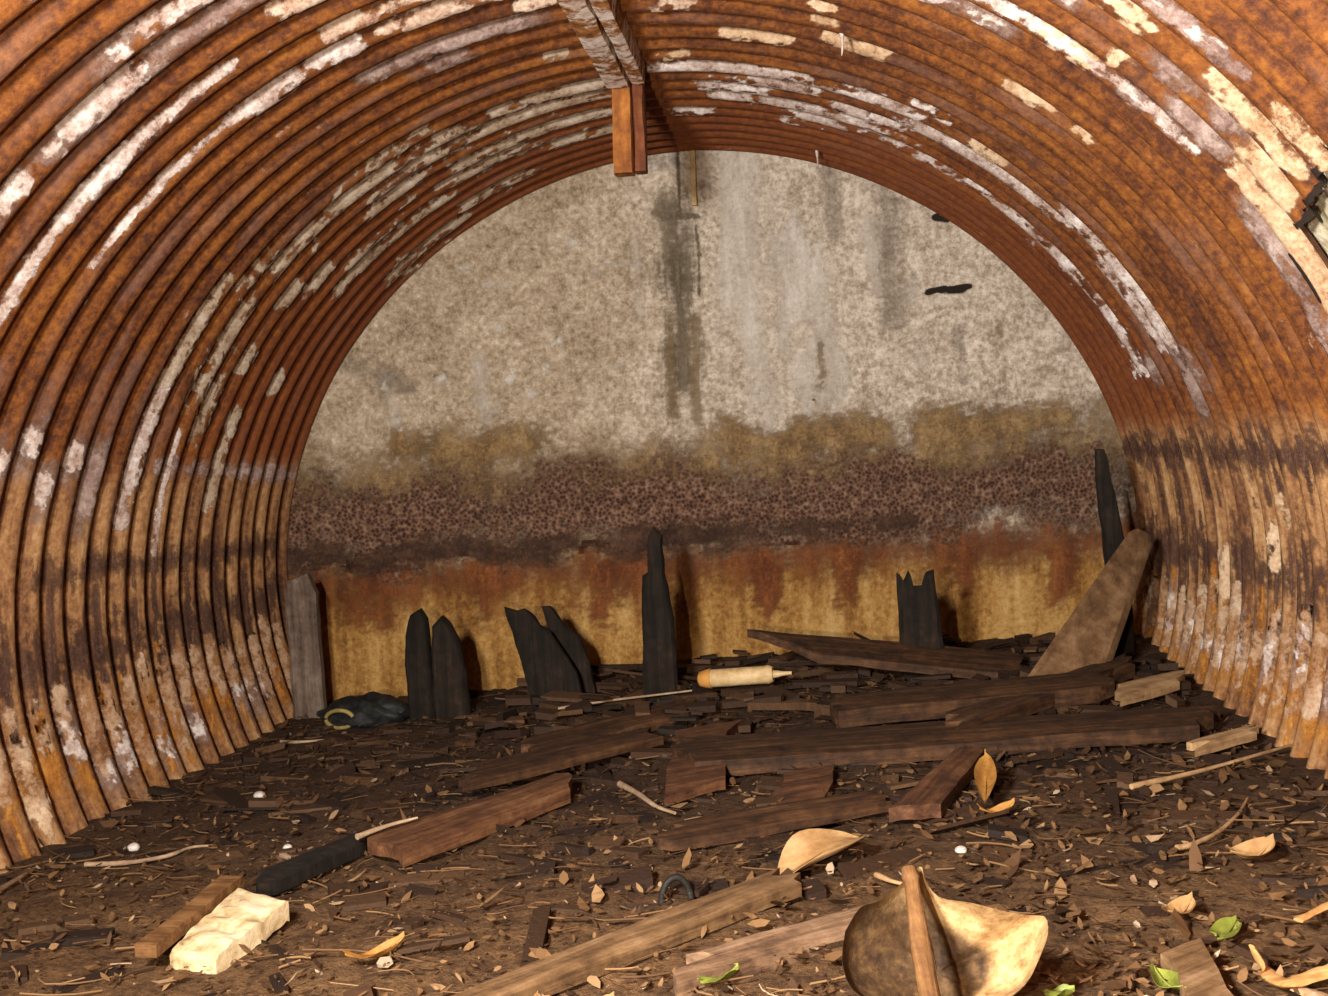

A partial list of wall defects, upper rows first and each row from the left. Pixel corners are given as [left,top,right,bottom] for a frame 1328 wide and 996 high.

peeling [0,0,326,216]
peeling [317,0,557,83]
water stain [718,26,796,46]
water stain [807,0,894,62]
peeling [1152,54,1328,356]
peeling [0,415,112,534]
peeling [0,615,292,847]
corrosion [5,645,290,858]
corrosion [288,540,648,630]
water stain [0,32,1328,749]
corrosion [664,512,1102,617]
corrosion [1133,560,1328,758]